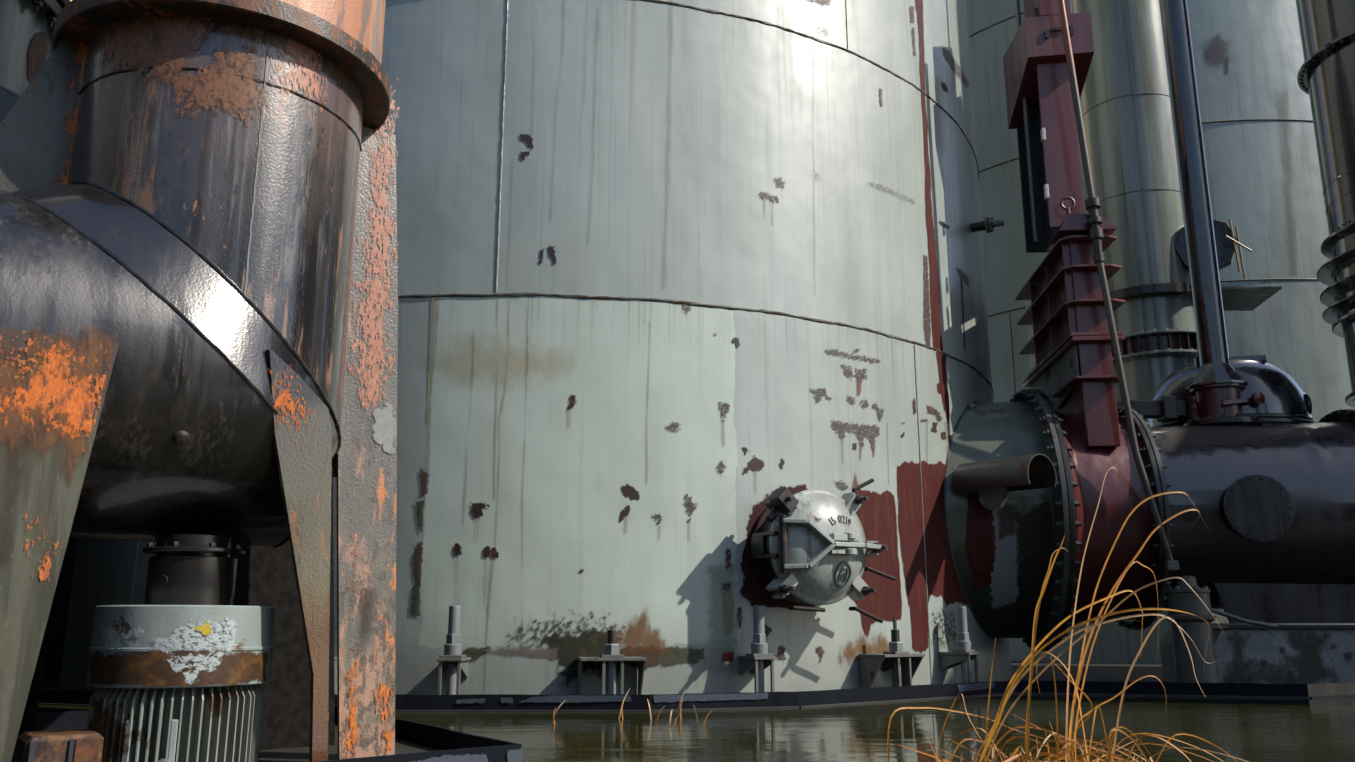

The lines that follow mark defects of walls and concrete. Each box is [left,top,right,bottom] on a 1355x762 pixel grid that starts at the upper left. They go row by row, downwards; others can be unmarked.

rust [173,32,327,127]
rust [348,78,399,420]
rust [923,255,931,349]
rust [0,326,112,482]
rust [270,366,317,450]
peeling [100,617,238,654]
water stain [462,611,705,687]